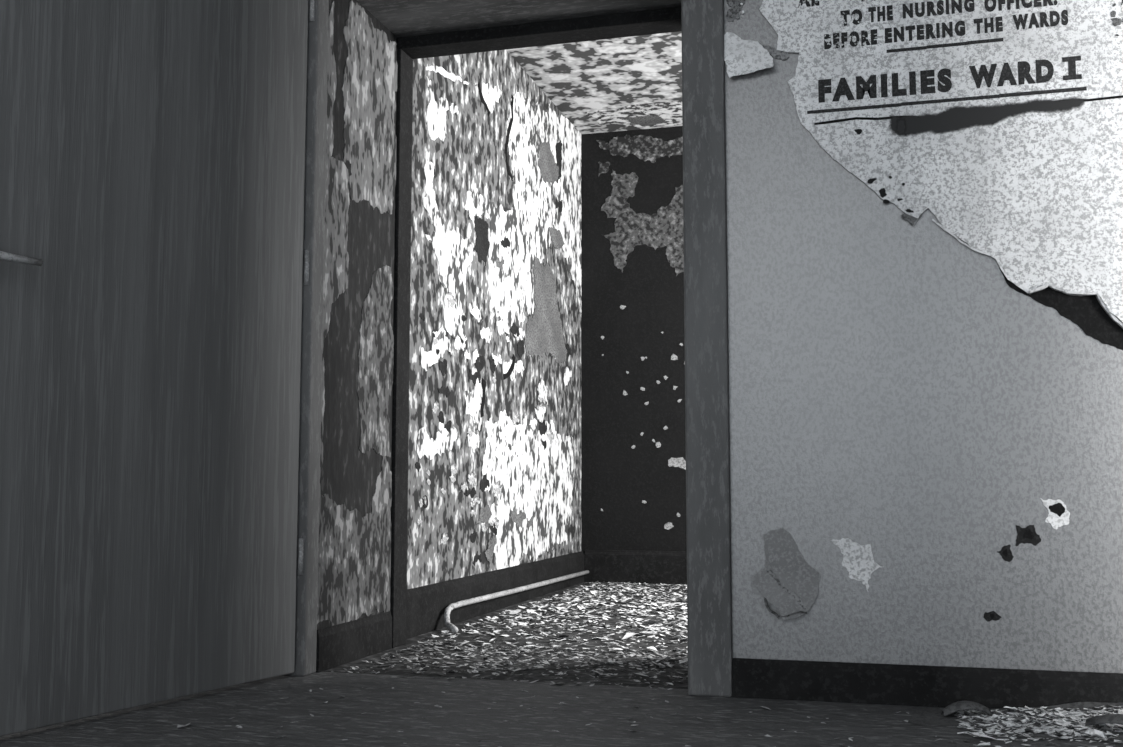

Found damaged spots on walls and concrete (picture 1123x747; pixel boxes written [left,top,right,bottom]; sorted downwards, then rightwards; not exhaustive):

crack [814,116,903,125]
crack [1064,94,1123,102]
peeling [584,102,684,276]
peeling [724,0,1123,350]
peeling [317,0,398,626]
peeling [415,65,582,570]
peeling [668,457,686,470]
spalling [997,498,1070,562]
peeling [831,538,882,591]
spalling [983,611,1002,622]